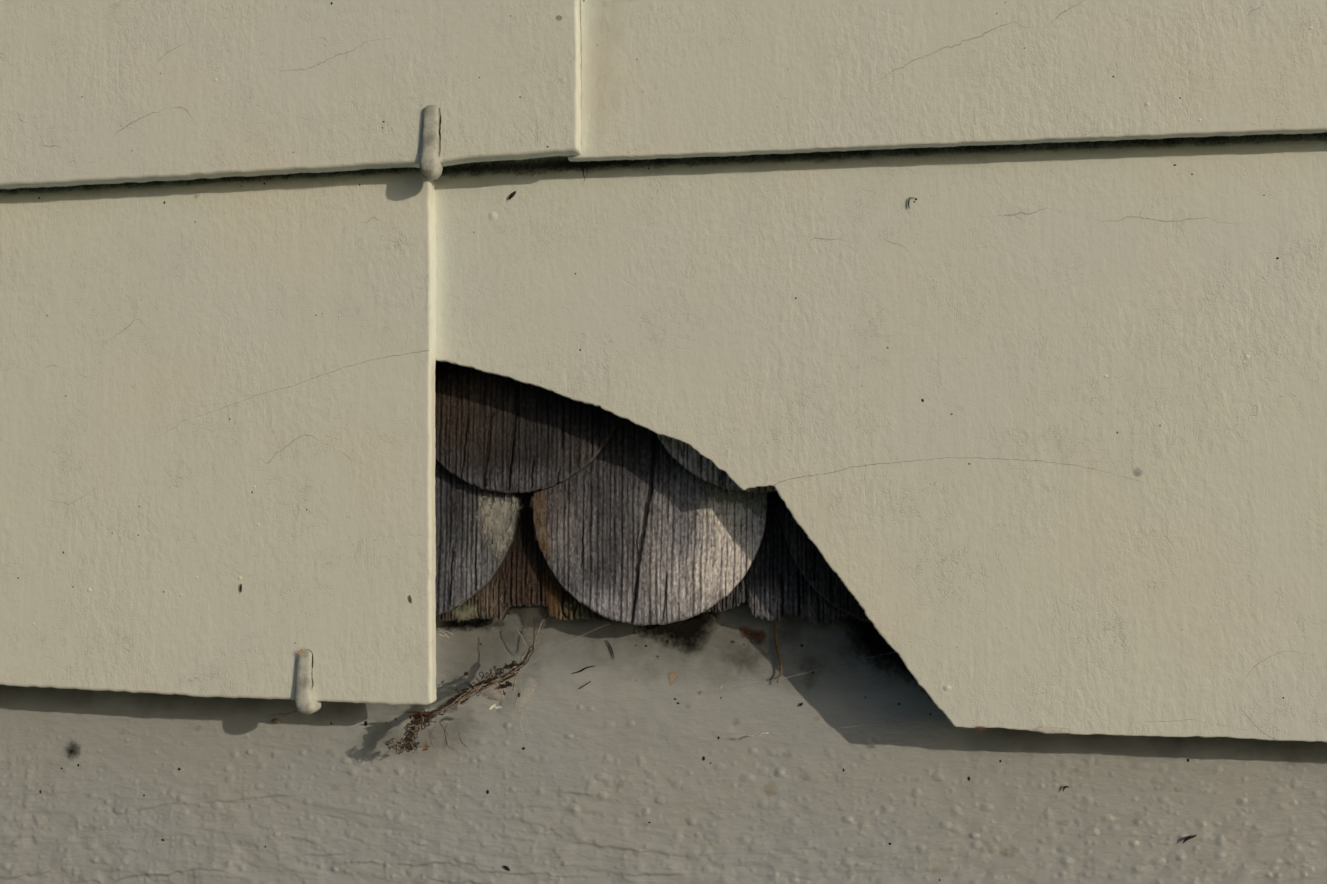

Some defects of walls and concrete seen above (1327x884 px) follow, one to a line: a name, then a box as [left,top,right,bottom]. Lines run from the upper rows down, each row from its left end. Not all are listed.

peeling [476,497,552,562]